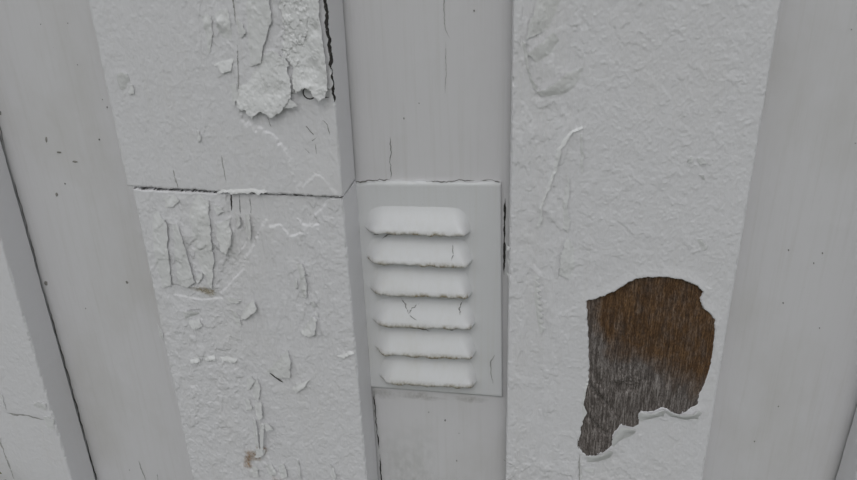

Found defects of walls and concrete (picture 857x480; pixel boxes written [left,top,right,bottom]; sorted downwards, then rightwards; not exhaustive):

peeling [231,0,328,118]
peeling [521,0,583,97]
peeling [217,188,267,196]
crack [356,139,392,183]
crack [426,177,499,185]
peeling [152,195,251,289]
peeling [244,376,273,458]
peeling [578,277,715,473]